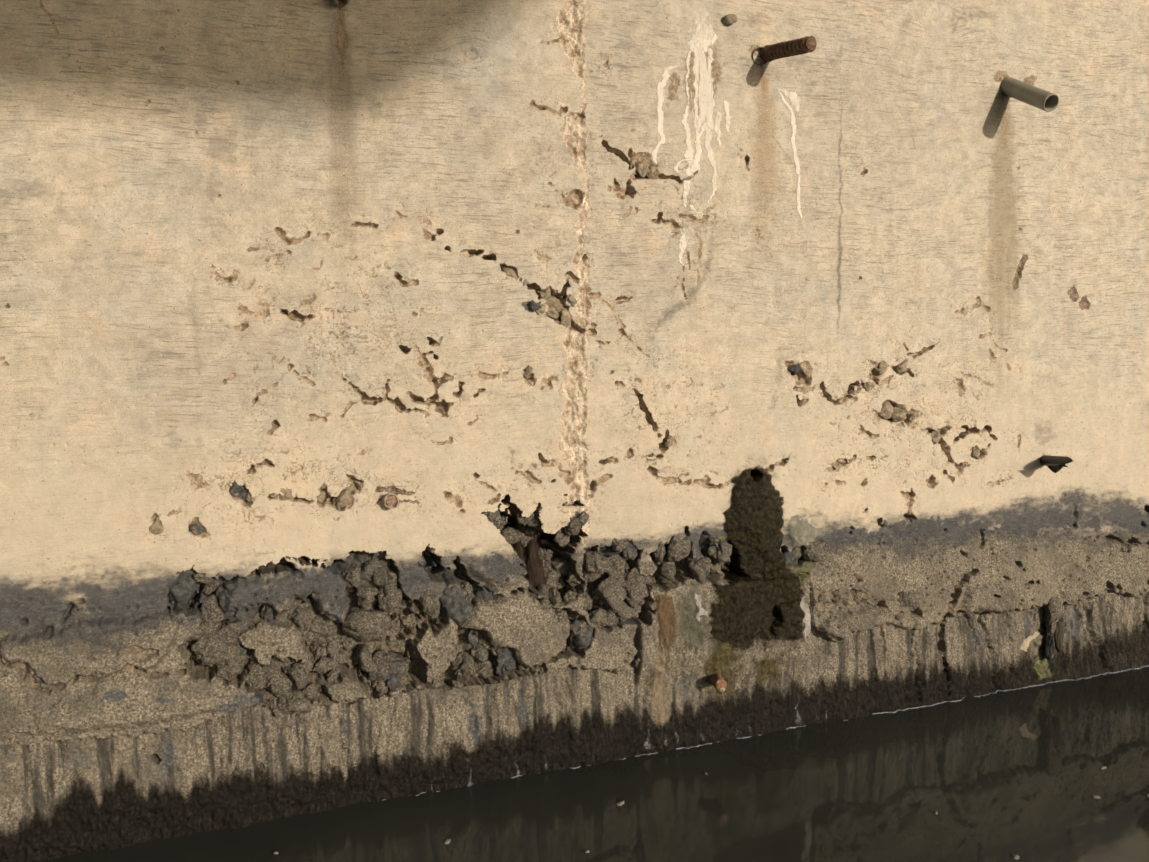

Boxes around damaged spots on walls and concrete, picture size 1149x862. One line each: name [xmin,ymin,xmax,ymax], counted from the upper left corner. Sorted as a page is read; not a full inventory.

crack [264,250,293,262]
crack [322,0,729,551]
crack [222,336,480,426]
spalling [784,360,815,394]
spalling [872,399,923,429]
spalling [149,509,211,538]
damp [782,489,1149,555]
damp [0,544,528,646]
spalling [167,456,732,718]
damp [800,595,811,638]
crack [937,529,986,672]
damp [0,616,1149,862]